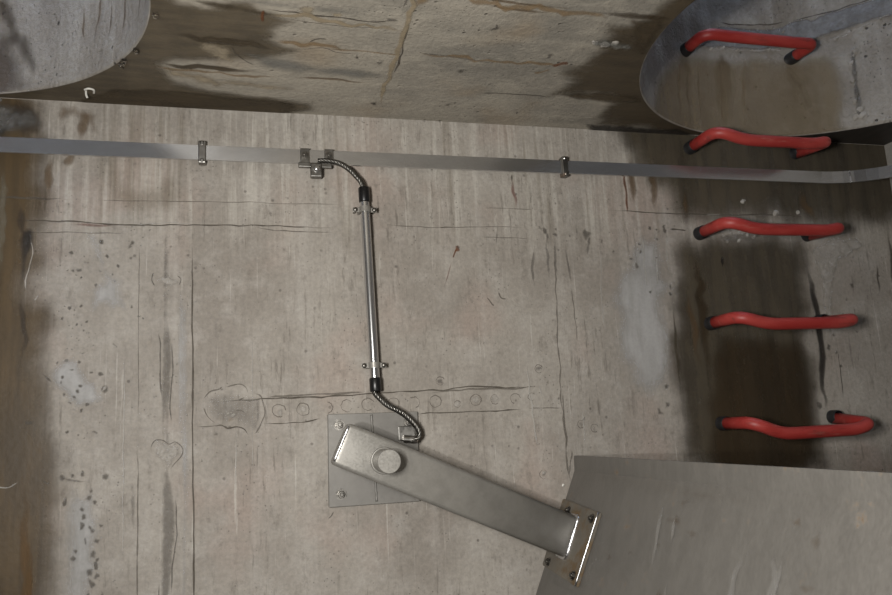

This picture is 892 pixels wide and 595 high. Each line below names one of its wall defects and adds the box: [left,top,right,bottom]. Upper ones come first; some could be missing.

water stain [0,0,337,138]
crack [275,10,408,72]
water stain [563,0,892,172]
crack [0,196,305,233]
water stain [650,177,892,222]
water stain [0,153,55,595]
water stain [617,226,860,467]